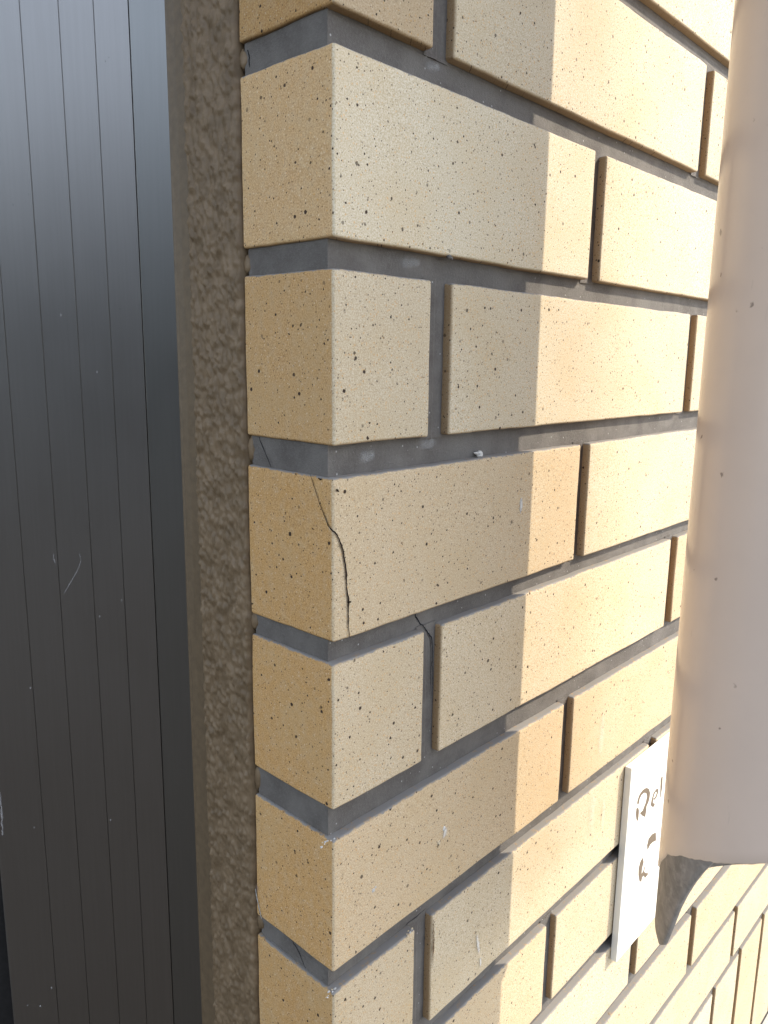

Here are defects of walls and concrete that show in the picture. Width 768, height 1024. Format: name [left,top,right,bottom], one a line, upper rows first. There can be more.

crack [310,475,351,637]
crack [415,614,433,700]